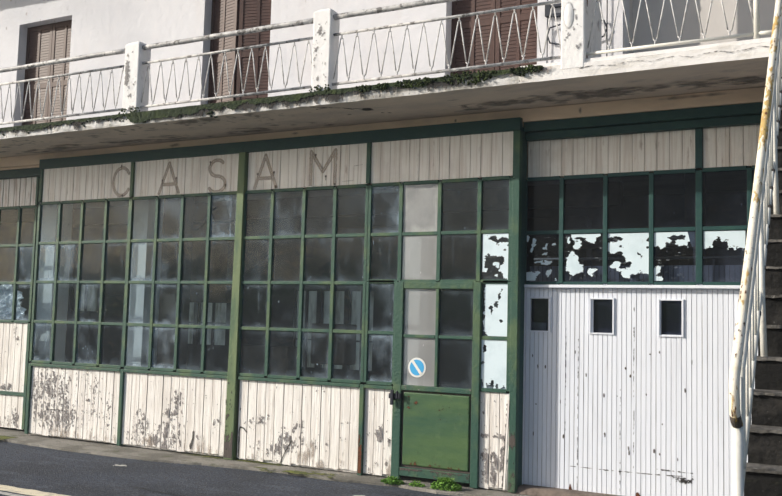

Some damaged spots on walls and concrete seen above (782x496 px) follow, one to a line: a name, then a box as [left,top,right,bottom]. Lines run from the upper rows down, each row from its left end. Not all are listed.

leakage [235,93,343,111]
leakage [427,79,459,92]
leakage [465,85,667,111]
leakage [678,77,766,97]
rust [758,7,782,157]
peeling [526,235,557,281]
peeling [566,232,690,281]
peeling [481,233,509,389]
peeling [30,368,116,437]
peeling [124,389,188,449]
peeling [253,421,304,462]
peeling [480,425,515,487]